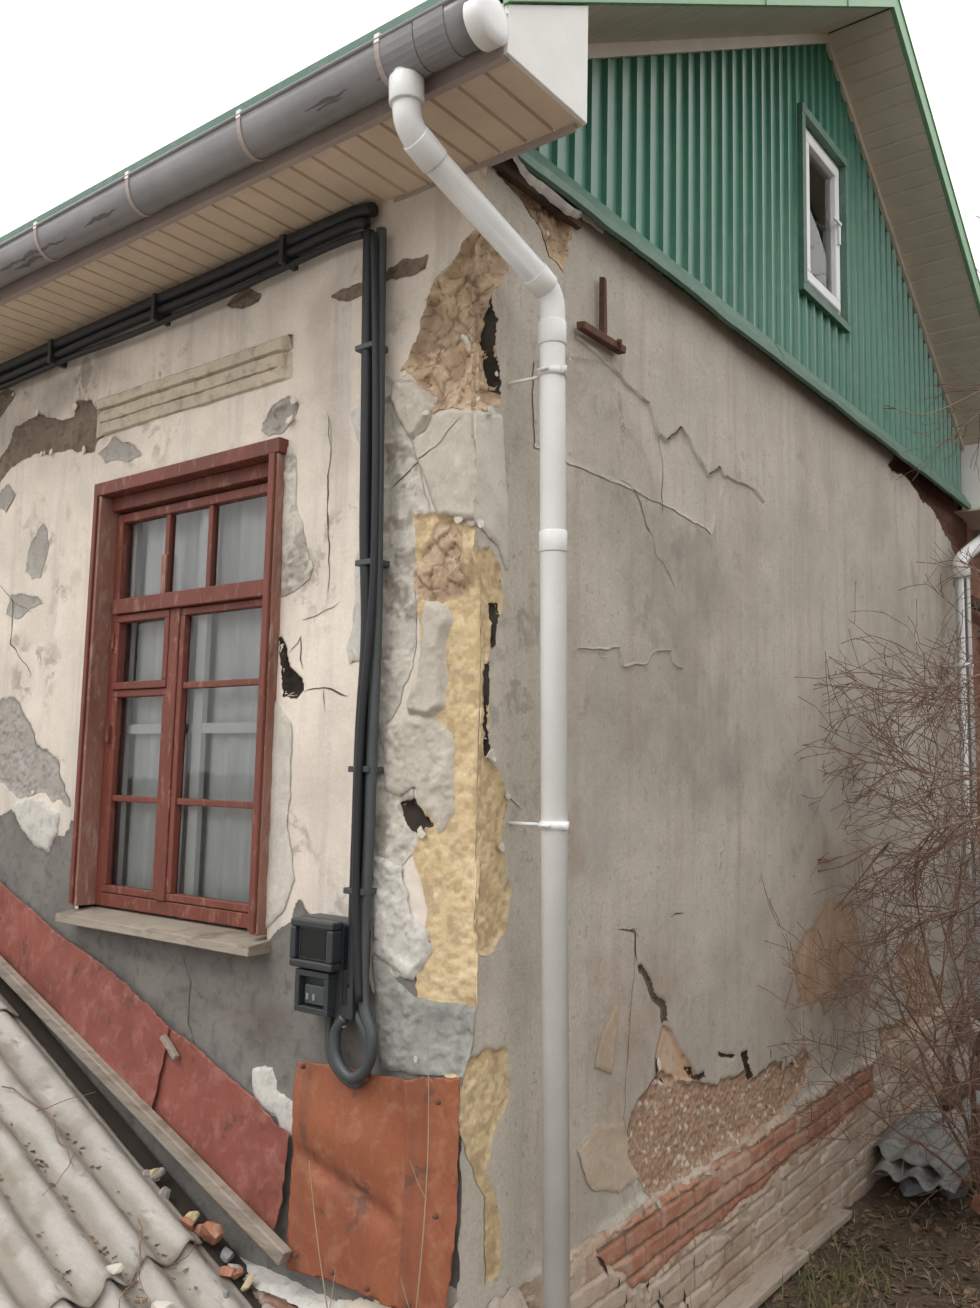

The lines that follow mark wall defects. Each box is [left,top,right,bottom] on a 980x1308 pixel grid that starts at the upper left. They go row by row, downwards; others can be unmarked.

peeling [400,229,508,415]
peeling [0,484,15,512]
peeling [6,593,43,619]
peeling [25,524,49,579]
peeling [350,405,361,445]
peeling [413,517,484,605]
crack [575,336,765,587]
peeling [0,697,70,807]
spalling [266,637,304,928]
spalling [400,798,434,838]
crack [617,928,639,1137]
spalling [627,1024,811,1209]